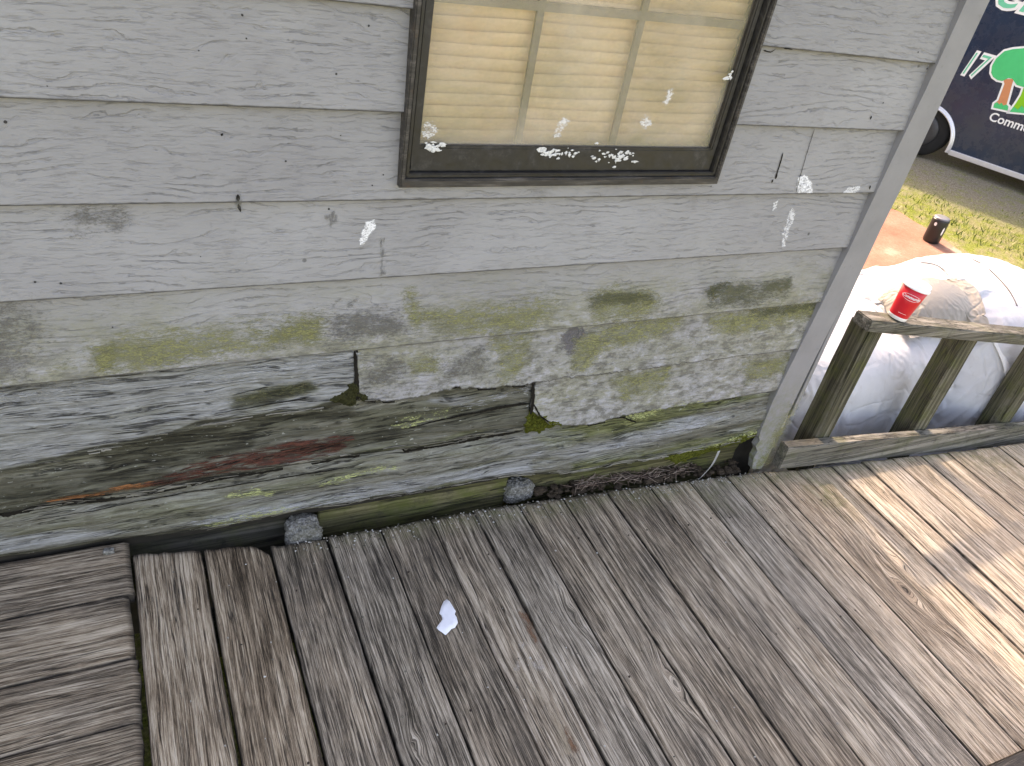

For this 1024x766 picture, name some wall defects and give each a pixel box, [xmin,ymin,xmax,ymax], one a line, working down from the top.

crack [772,132,814,191]
leakage [589,292,653,308]
leakage [751,303,815,317]
crack [353,351,395,403]
crack [402,382,549,453]
leakage [45,436,354,502]